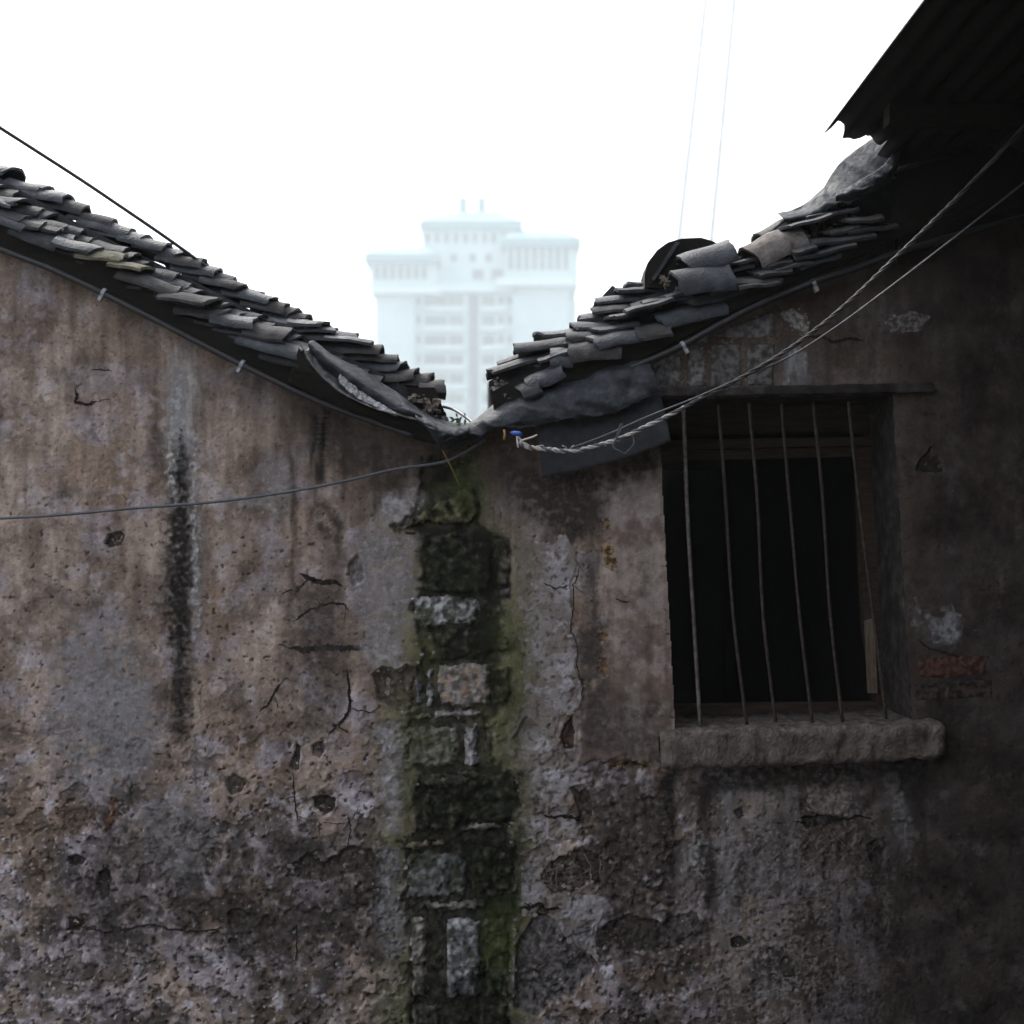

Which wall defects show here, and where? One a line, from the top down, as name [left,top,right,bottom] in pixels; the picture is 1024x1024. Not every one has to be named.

crack [74,368,111,406]
flaking render [884,310,930,333]
water stain [161,347,203,730]
crack [259,681,283,712]
crack [278,573,390,735]
flaking render [373,484,710,1024]
crack [544,554,586,707]